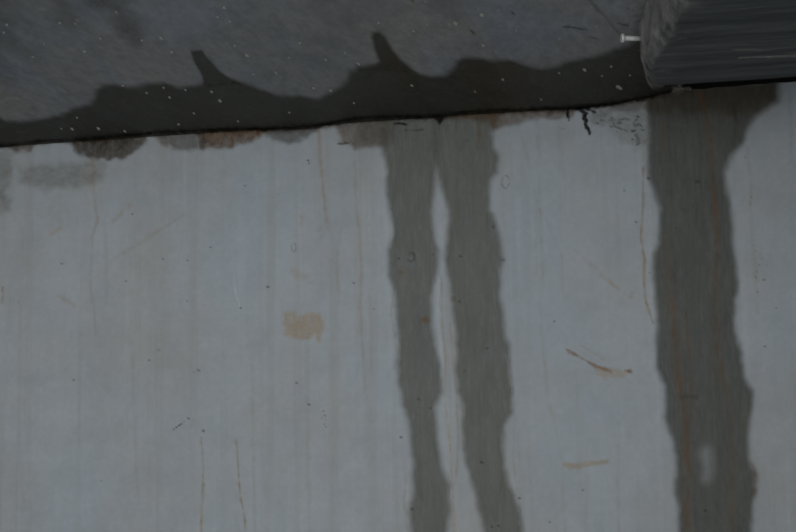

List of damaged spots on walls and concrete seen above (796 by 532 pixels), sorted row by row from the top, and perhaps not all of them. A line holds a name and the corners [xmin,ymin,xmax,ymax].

damp [0,33,673,532]
damp [648,83,777,532]